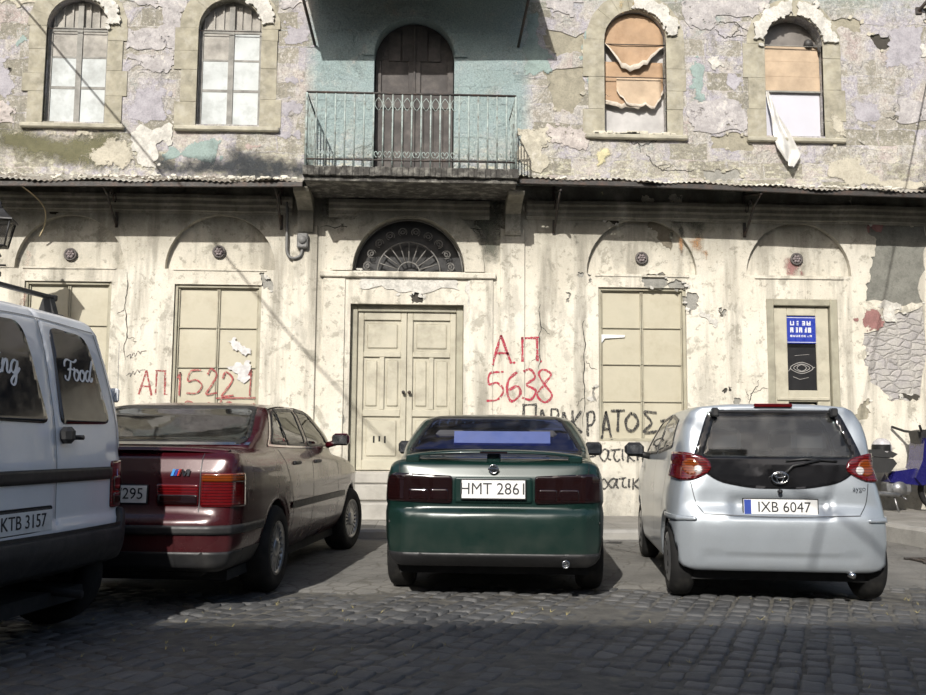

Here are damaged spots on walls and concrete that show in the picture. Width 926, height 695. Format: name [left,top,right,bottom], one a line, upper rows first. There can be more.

peeling [0,56,16,124]
flaking render [522,0,588,114]
crack [715,21,748,38]
peeling [631,0,926,69]
peeling [895,97,926,126]
water stain [156,150,303,188]
peeling [517,123,590,173]
flaking render [854,224,926,402]
crack [577,321,597,424]
flaking render [855,398,873,421]